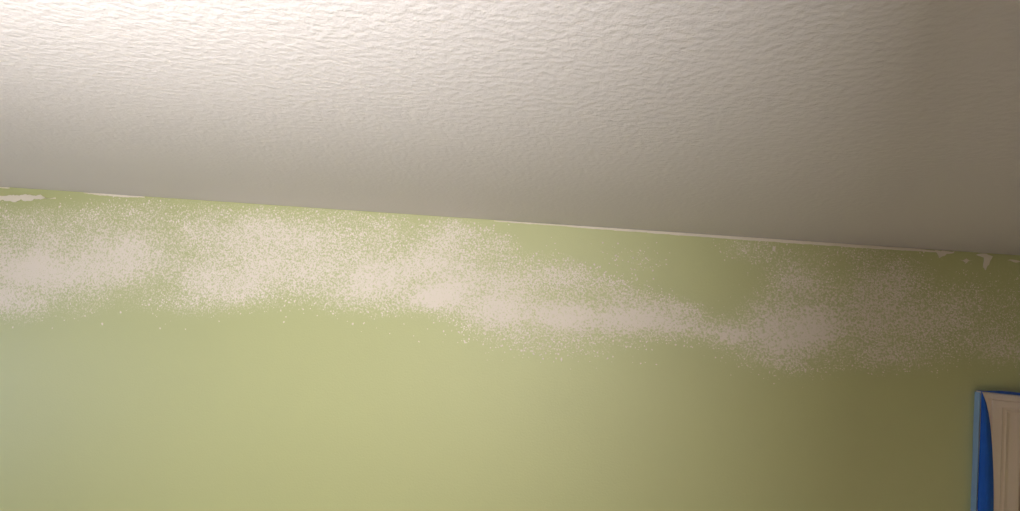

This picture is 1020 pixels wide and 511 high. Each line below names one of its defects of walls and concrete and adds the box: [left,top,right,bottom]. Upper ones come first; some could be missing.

leakage [0,216,191,328]
leakage [295,260,864,370]